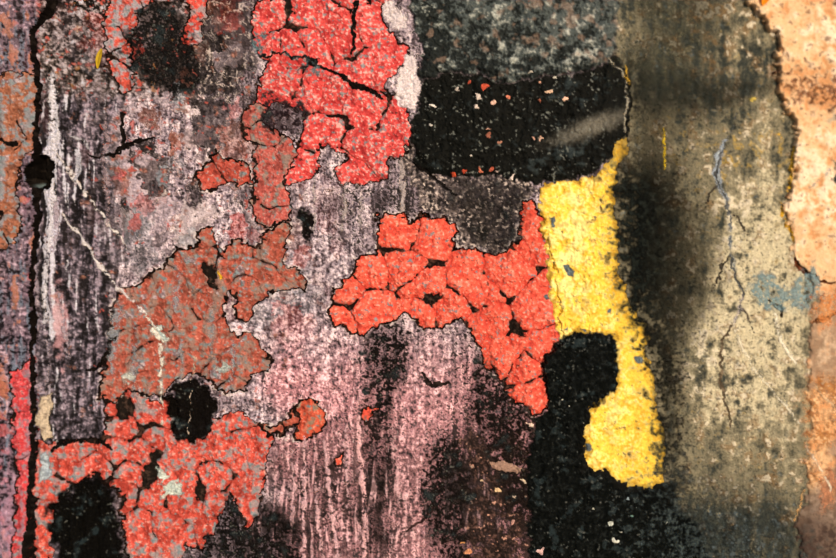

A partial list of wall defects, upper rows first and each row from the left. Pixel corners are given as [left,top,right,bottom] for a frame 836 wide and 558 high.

crack [0,0,58,159]
peeling [474,84,496,108]
crack [21,187,113,558]
peeling [0,0,421,558]
peeling [326,198,568,427]
crack [705,113,755,427]